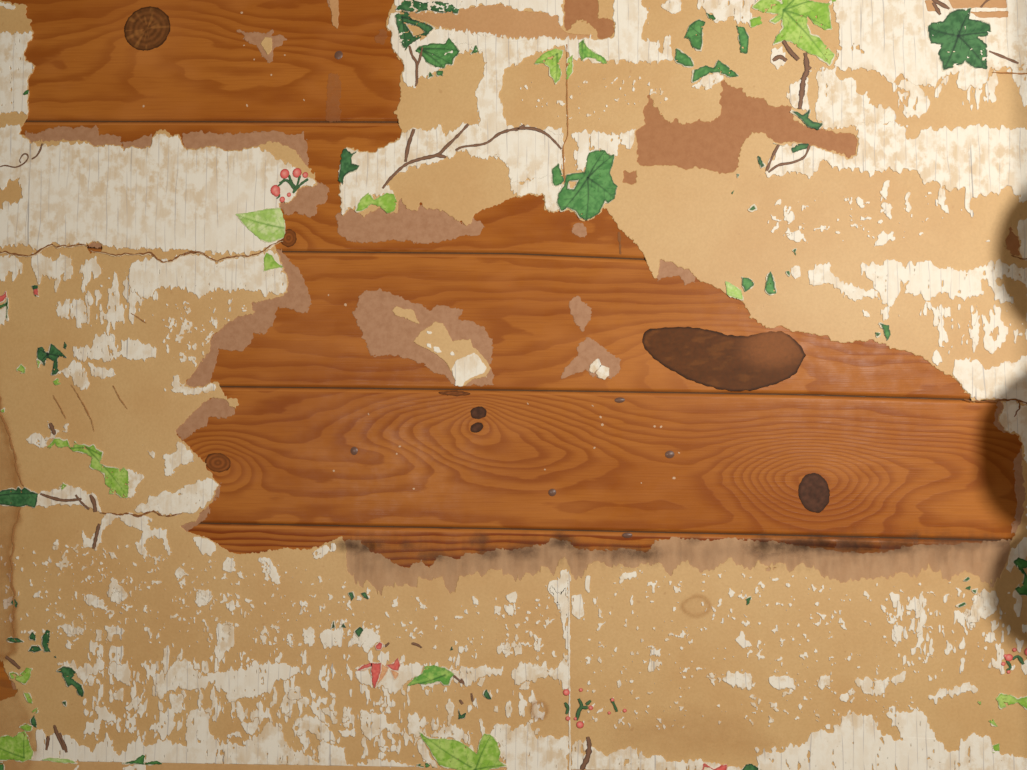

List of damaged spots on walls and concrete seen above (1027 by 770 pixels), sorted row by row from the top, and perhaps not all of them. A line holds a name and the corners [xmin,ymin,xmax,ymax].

crack [0,240,282,263]
peeling [1,0,1027,616]
peeling [893,624,903,644]
peeling [885,592,927,638]